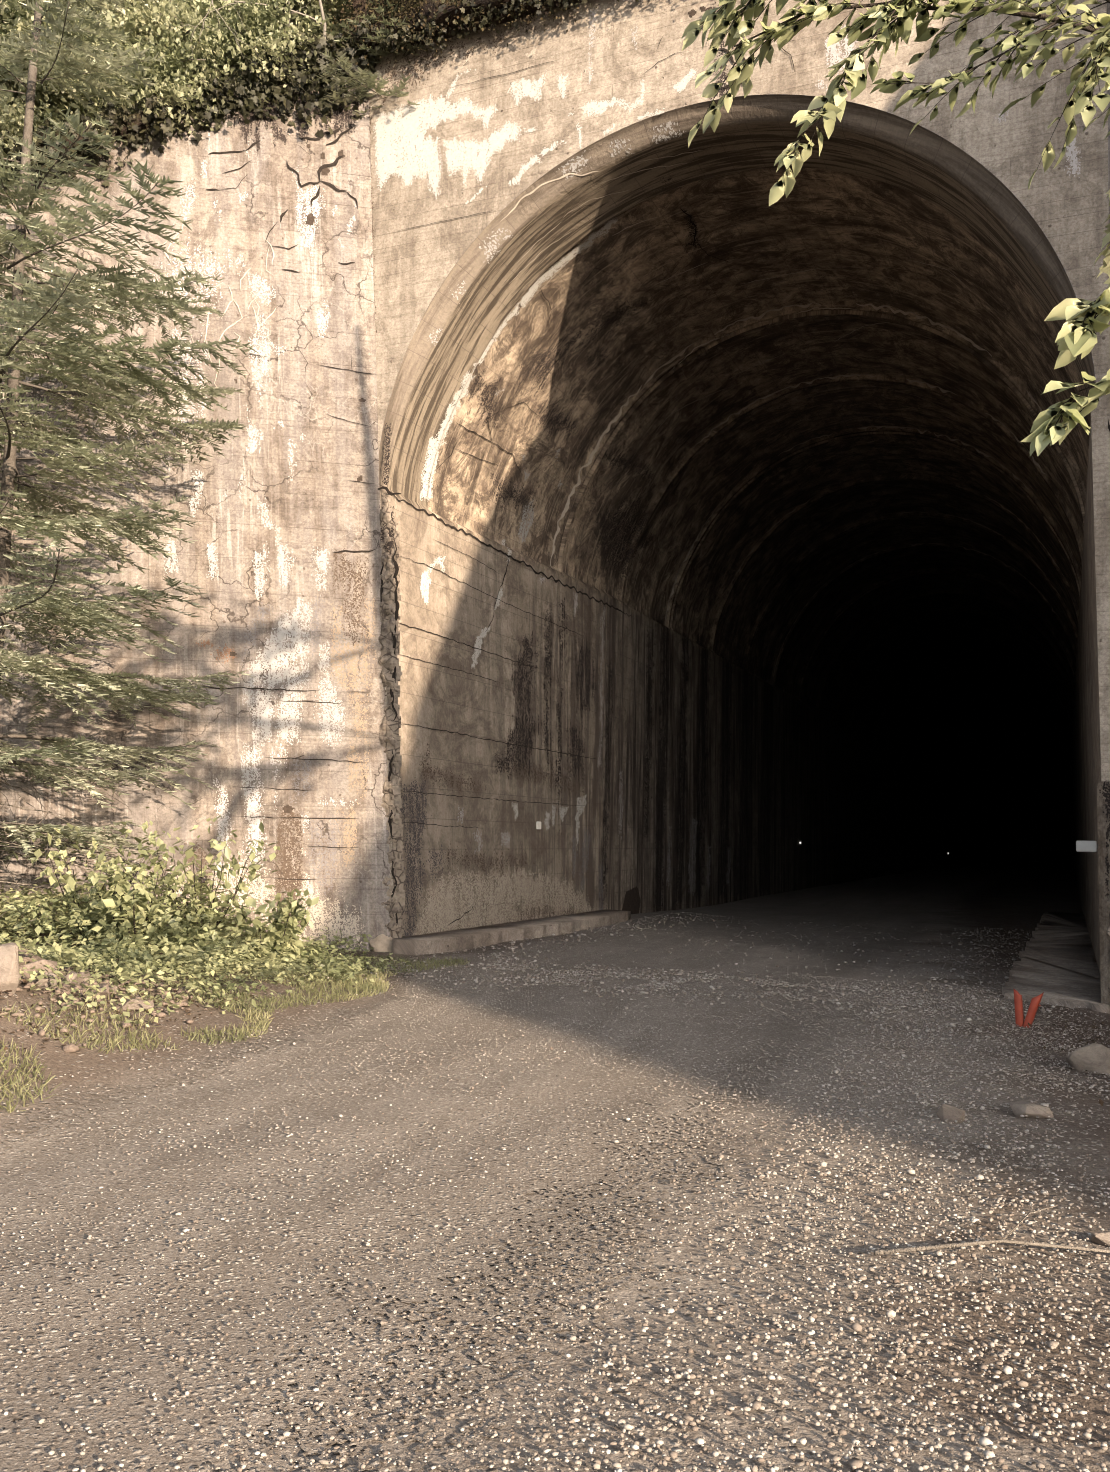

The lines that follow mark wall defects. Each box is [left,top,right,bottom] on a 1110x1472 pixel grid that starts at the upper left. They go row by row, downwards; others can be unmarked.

crack [719,48,746,89]
crack [164,126,358,387]
spalling [378,493,406,938]
leakage [419,556,446,605]
leakage [400,588,624,937]
leakage [641,509,825,912]
leakage [1099,780,1110,903]